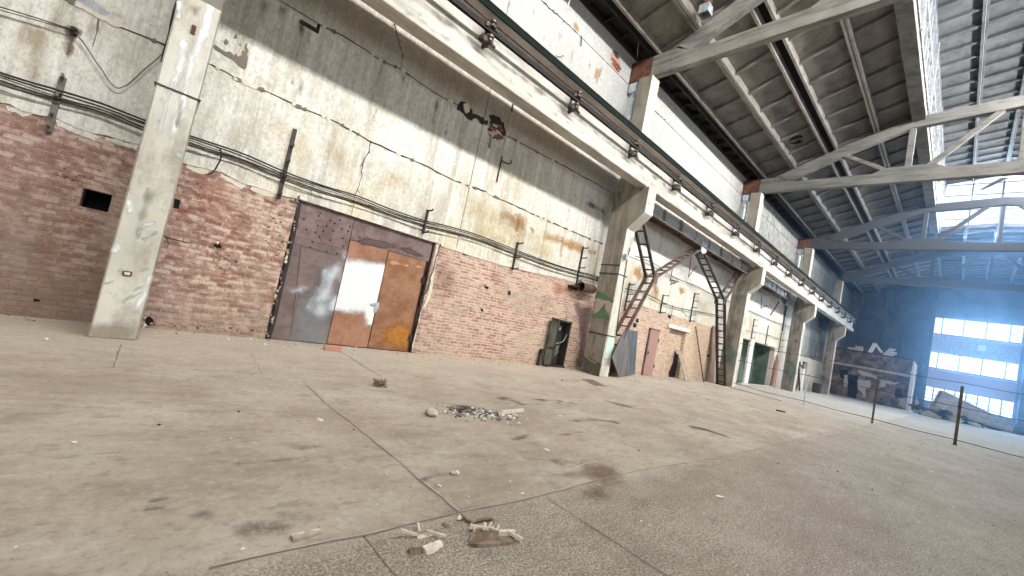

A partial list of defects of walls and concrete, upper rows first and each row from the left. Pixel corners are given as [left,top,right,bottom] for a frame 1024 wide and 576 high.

peeling [213,34,266,92]
peeling [6,106,33,117]
peeling [56,119,138,151]
spalling [457,101,518,148]
peeling [173,153,276,209]
crack [351,143,371,214]
rust [547,235,596,254]